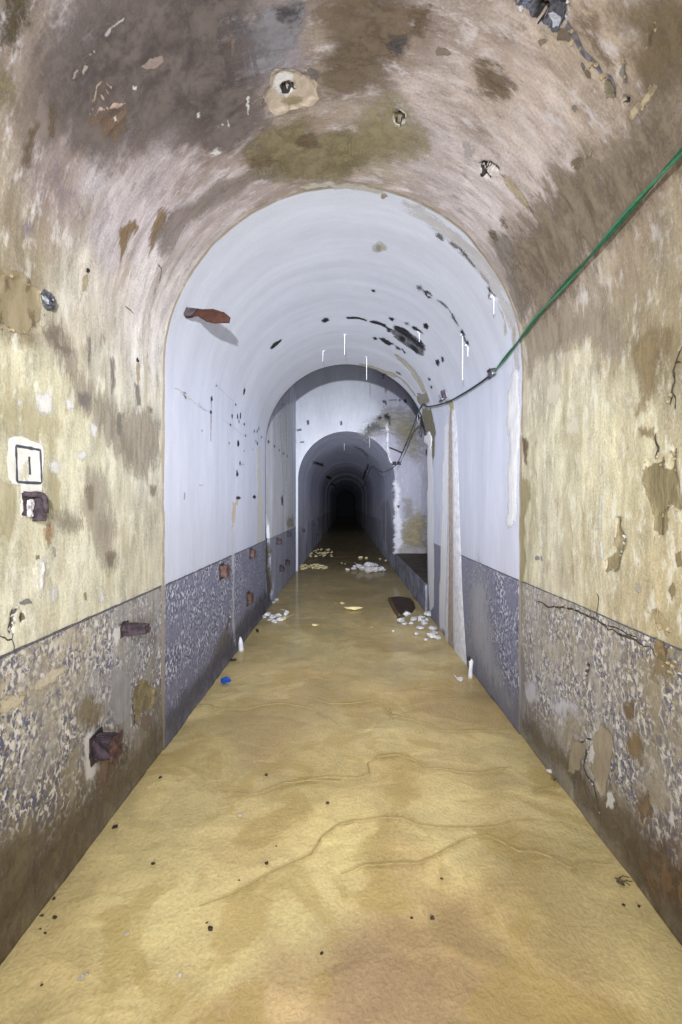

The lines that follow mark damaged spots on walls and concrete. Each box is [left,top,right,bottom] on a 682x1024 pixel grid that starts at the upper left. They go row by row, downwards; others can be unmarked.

spalling [514,0,571,46]
spalling [90,81,126,141]
spalling [261,67,319,116]
peeling [0,267,45,335]
corrosion [184,307,230,324]
water stain [354,364,449,631]
peeling [598,495,627,572]
peeling [642,448,682,538]
crack [522,582,655,655]
spalling [567,724,615,809]